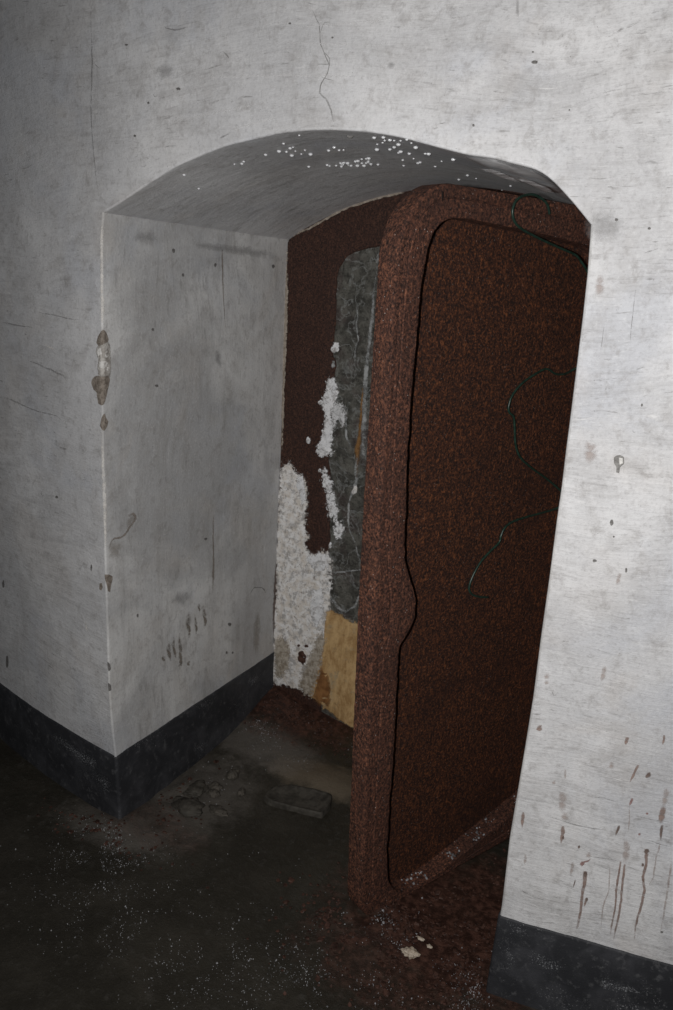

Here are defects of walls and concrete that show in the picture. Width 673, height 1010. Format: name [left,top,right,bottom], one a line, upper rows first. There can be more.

flaking render [91,330,111,431]
rust [571,846,590,923]
rust [602,842,628,931]
rust [636,849,659,925]